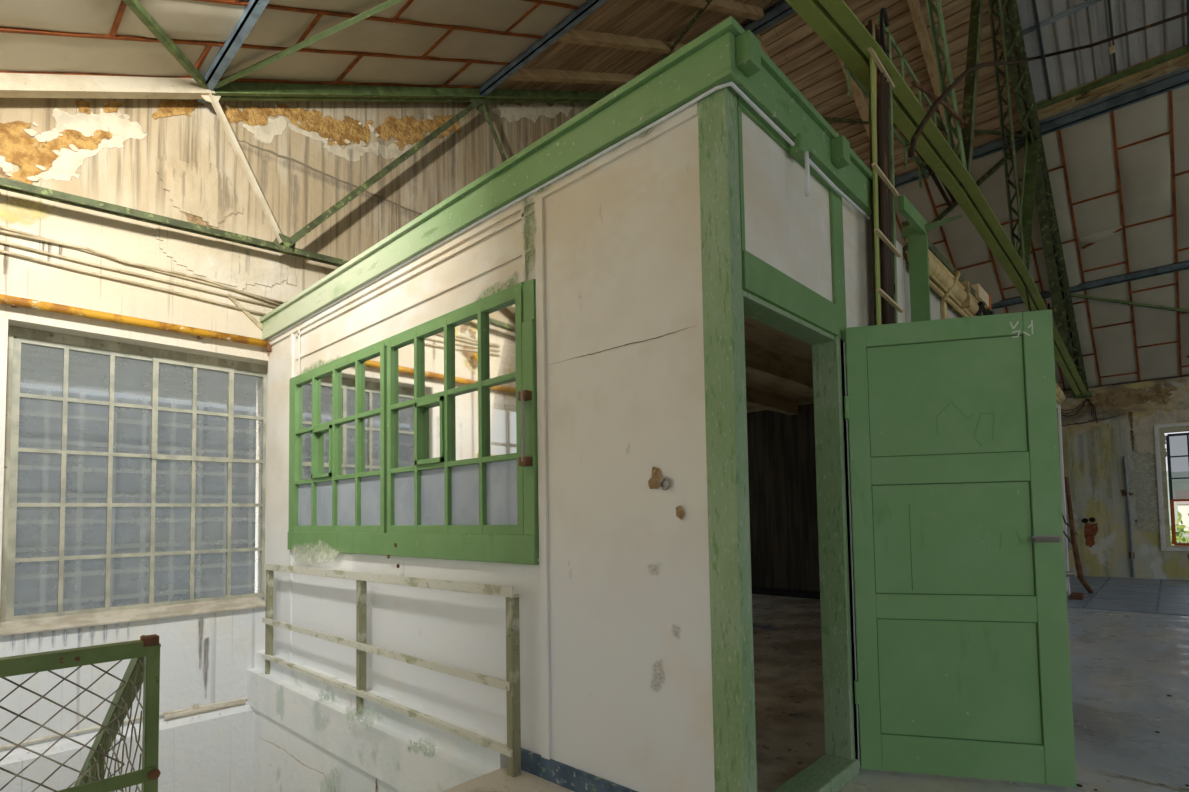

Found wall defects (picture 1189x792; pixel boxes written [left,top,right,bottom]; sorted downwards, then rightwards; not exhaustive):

flaking render [0,99,204,185]
flaking render [221,103,461,162]
damp [0,200,45,222]